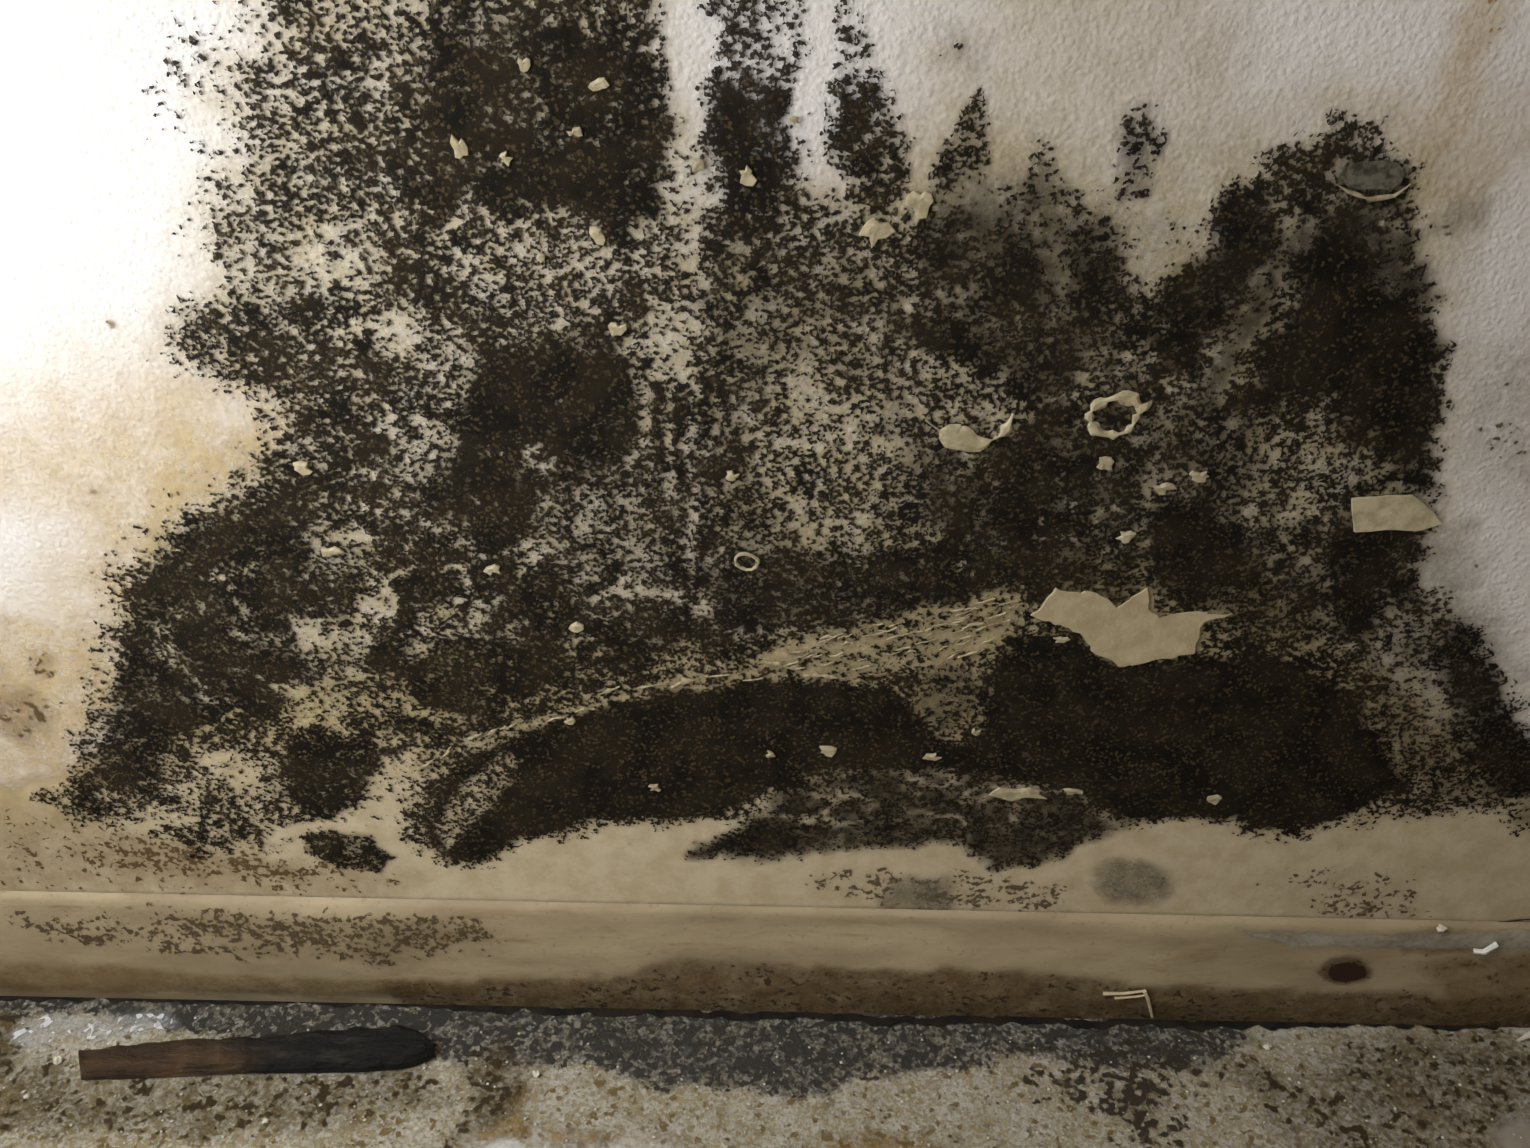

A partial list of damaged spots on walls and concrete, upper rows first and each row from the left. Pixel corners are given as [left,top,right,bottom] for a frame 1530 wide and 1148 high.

damp [167,17,223,47]
damp [831,0,875,70]
damp [163,47,187,97]
peeling [450,133,469,159]
peeling [740,165,757,186]
damp [1107,103,1168,216]
peeling [859,218,895,249]
peeling [925,413,1014,452]
peeling [1351,495,1443,532]
spalling [544,587,1233,725]
damp [9,903,501,969]
damp [0,998,1530,1148]